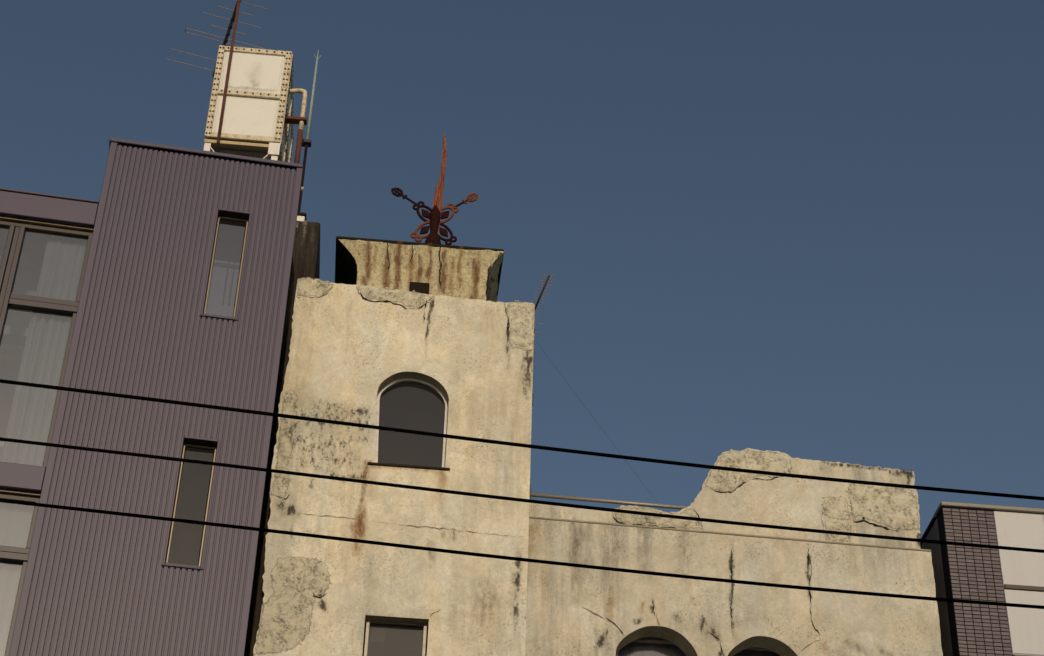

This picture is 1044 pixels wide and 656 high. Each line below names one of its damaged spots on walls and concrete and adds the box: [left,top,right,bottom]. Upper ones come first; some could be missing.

rust [384,241,495,300]
water stain [290,404,370,478]
spalling [704,449,792,493]
spalling [614,507,703,530]
spalling [821,495,852,543]
spalling [256,556,331,654]
crack [711,537,734,656]
crack [804,545,821,649]